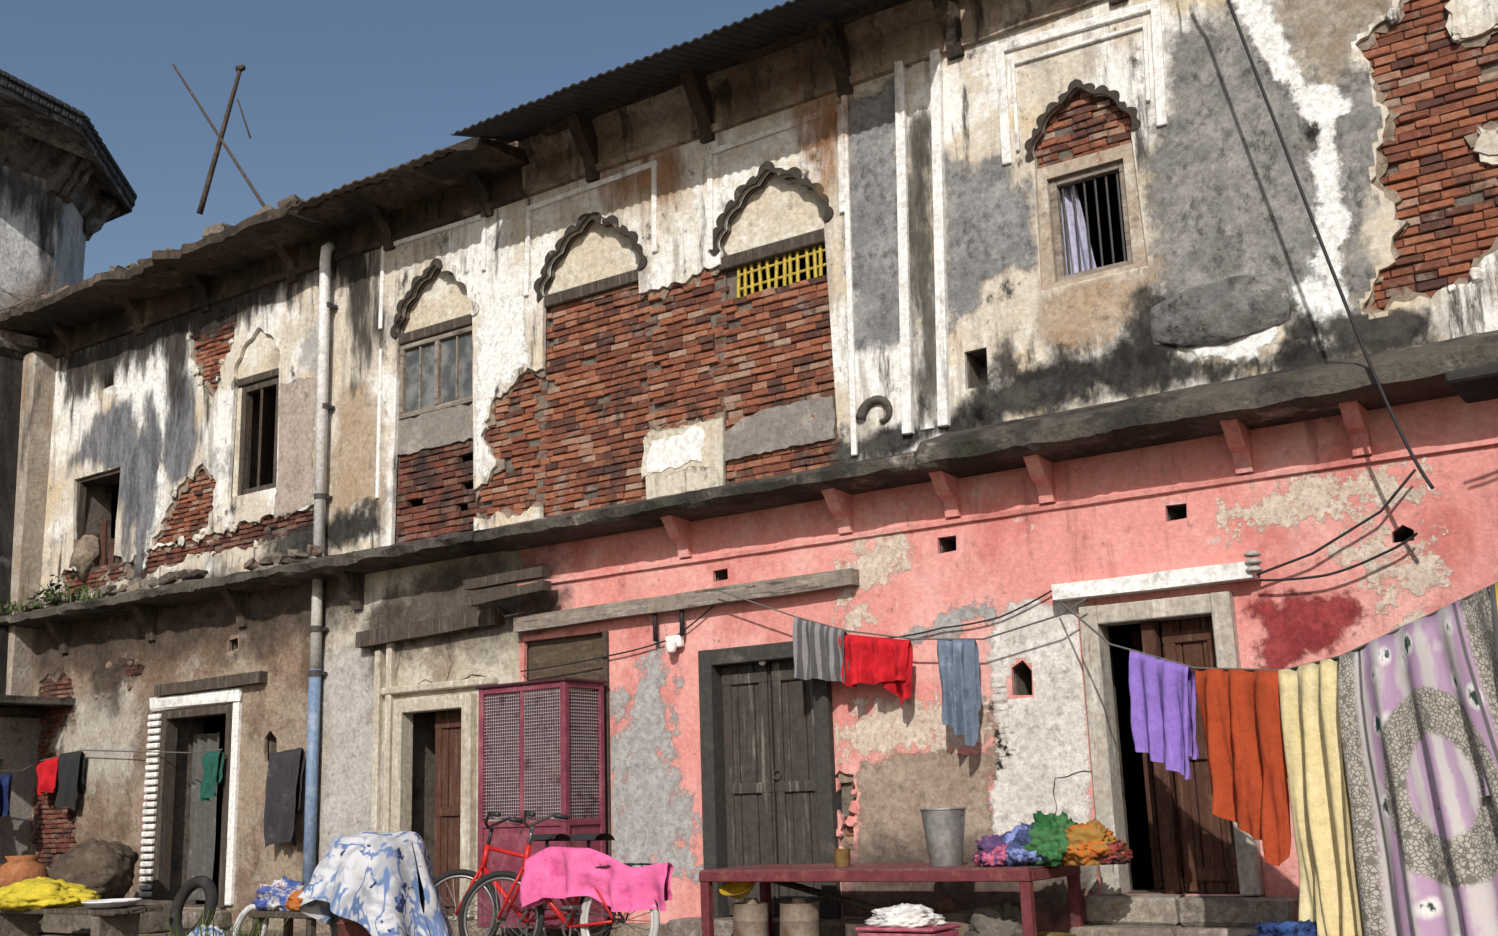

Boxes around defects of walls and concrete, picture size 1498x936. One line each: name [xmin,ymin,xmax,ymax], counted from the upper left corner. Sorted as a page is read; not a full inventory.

water stain [0,163,63,300]
water stain [830,0,1429,465]
flaking render [1357,0,1498,313]
water stain [0,350,23,707]
flaking render [63,465,327,595]
water stain [39,248,387,594]
water stain [474,294,530,477]
flaking render [476,364,547,520]
flaking render [641,267,727,480]
peeling [1208,444,1454,669]
water stain [34,556,569,857]
peeling [610,618,704,885]